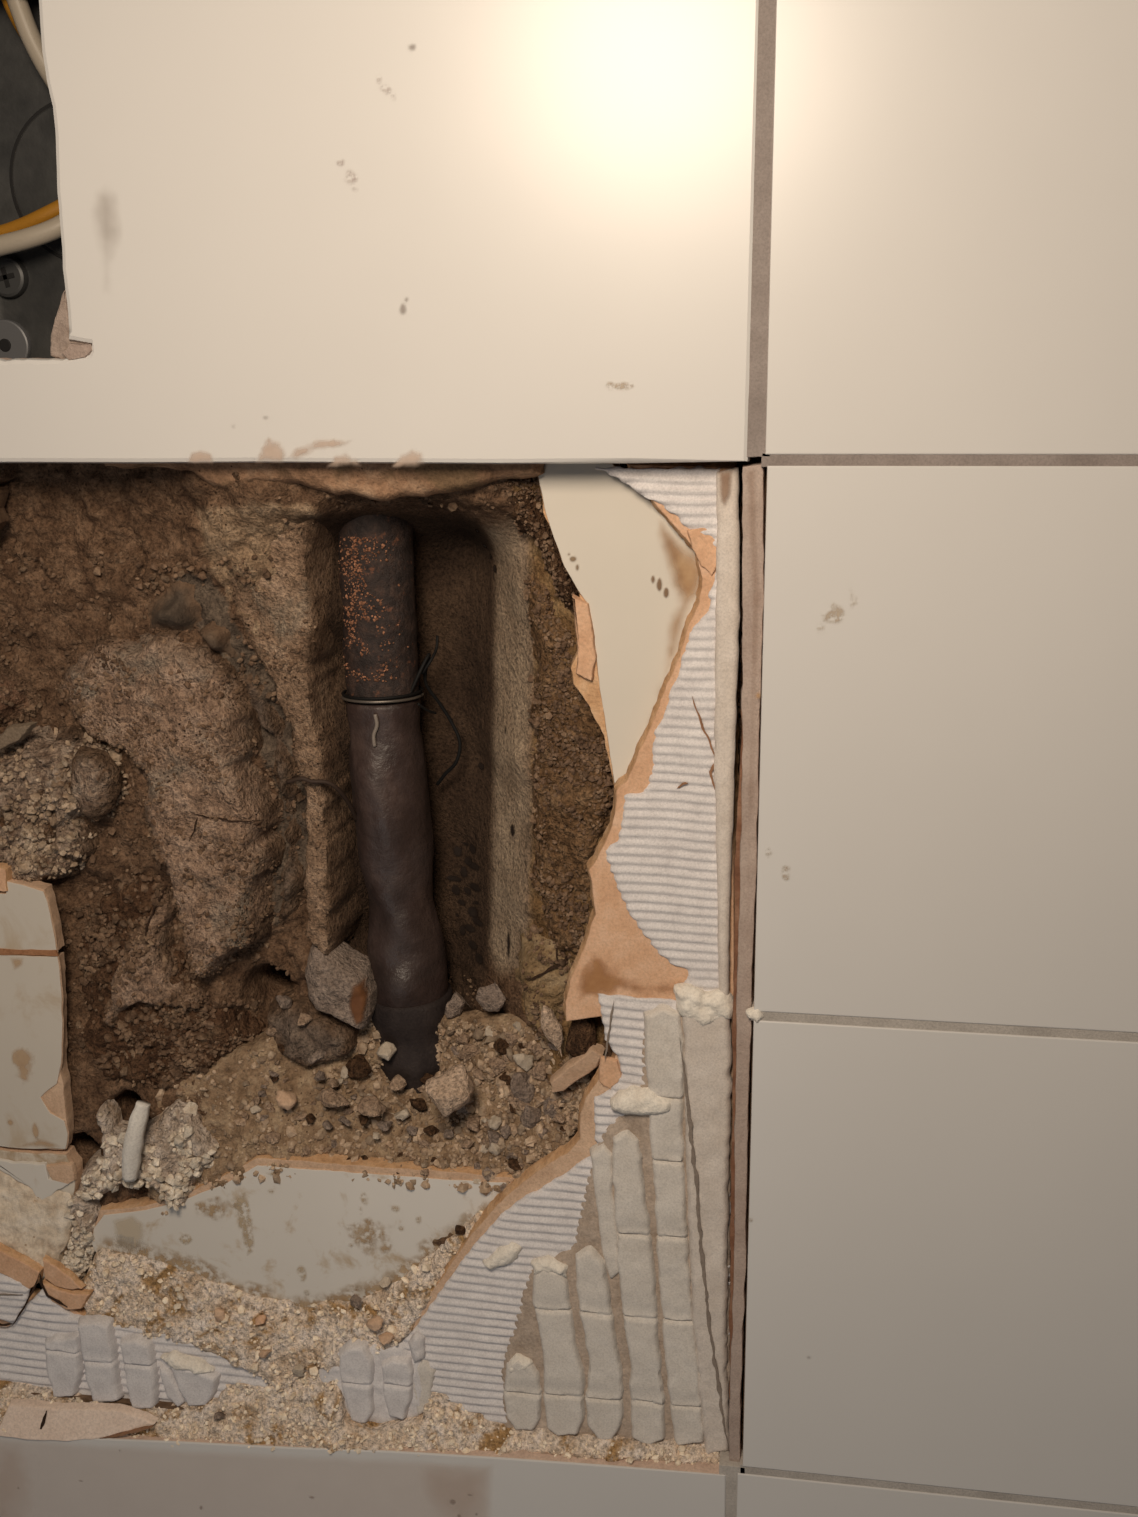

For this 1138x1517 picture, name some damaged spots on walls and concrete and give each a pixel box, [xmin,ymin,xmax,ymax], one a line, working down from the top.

spalling [0,463,18,486]
peeling [191,453,210,461]
peeling [261,441,349,464]
peeling [396,454,419,465]
peeling [687,528,716,575]
rust [339,536,409,682]
spalling [484,477,614,1046]
spalling [0,517,377,1280]
peeling [550,1043,622,1092]